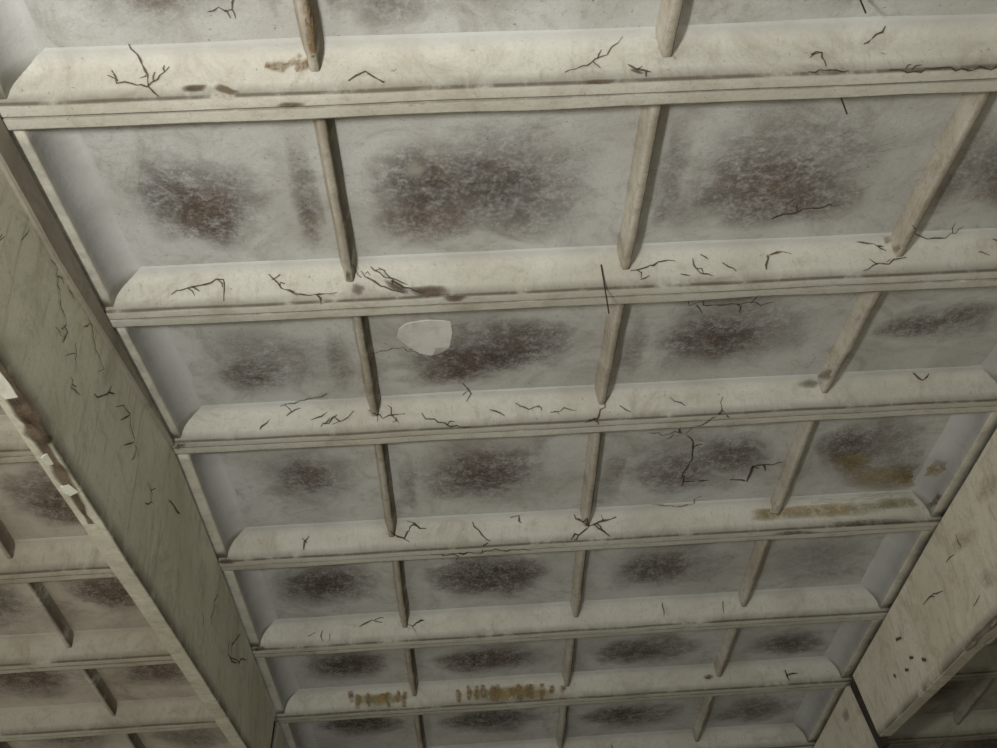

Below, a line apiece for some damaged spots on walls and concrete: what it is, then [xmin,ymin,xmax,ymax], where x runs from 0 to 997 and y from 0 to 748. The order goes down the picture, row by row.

crack [107,44,169,96]
crack [172,279,225,301]
peeling [397,319,453,355]
crack [260,384,631,429]
spalling [0,362,94,524]
crack [652,397,729,507]
crack [732,462,782,482]
crack [571,514,616,540]
rust [456,683,565,703]